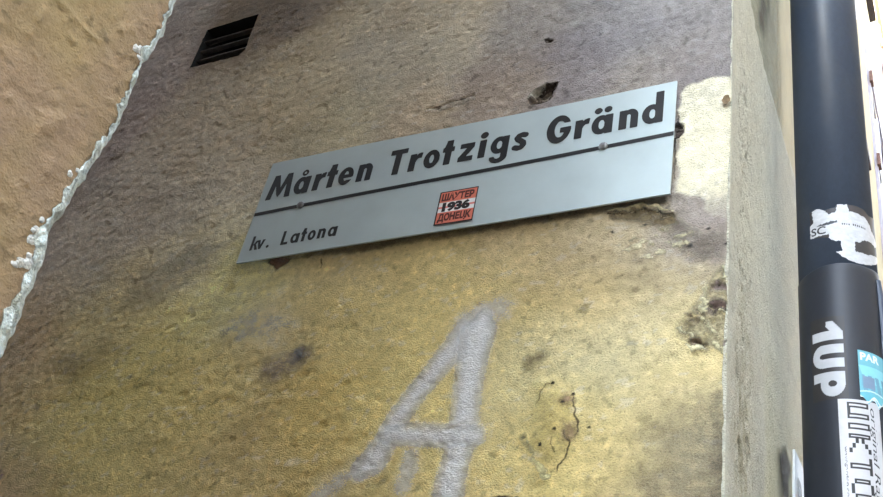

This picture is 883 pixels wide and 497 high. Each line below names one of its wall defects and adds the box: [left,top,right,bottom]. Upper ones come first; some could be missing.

flaking render [608,202,692,258]
flaking render [678,265,727,359]